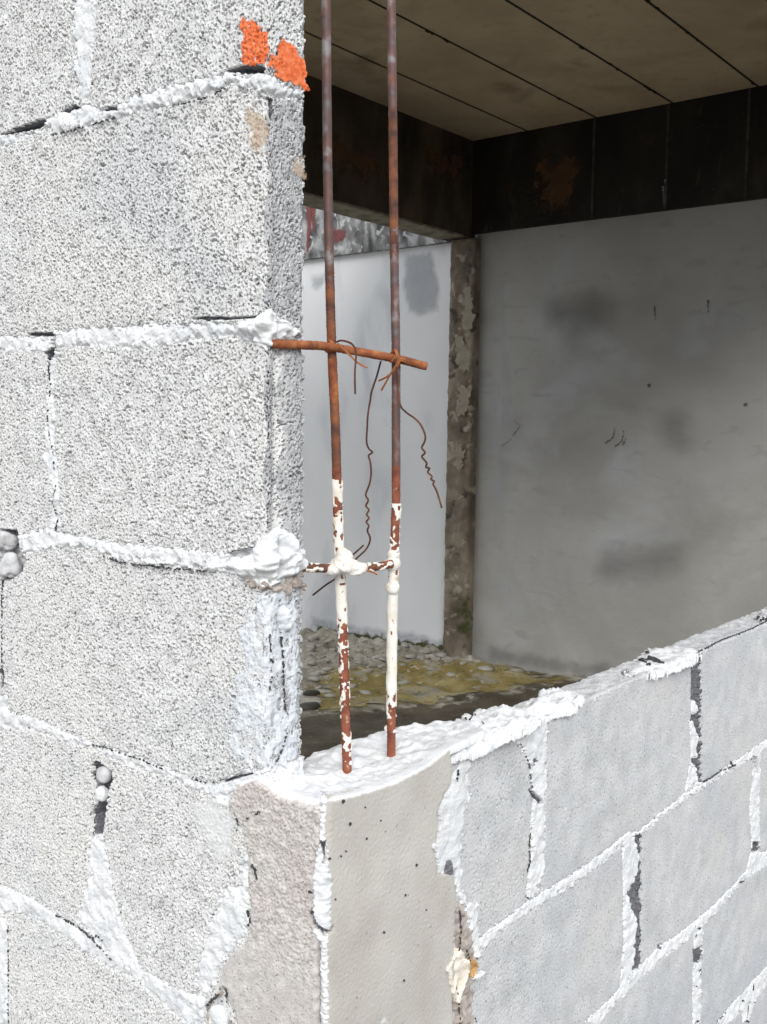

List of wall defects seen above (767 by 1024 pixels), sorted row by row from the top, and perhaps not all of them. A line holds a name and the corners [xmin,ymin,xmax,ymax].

rust [320,135,379,181]
rust [533,154,580,214]
water stain [406,255,436,311]
peeling [452,285,476,417]